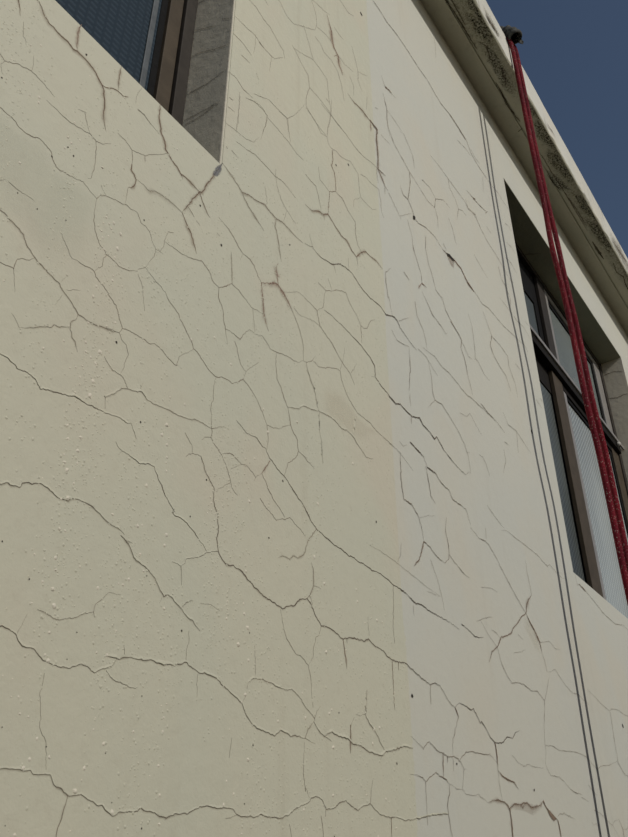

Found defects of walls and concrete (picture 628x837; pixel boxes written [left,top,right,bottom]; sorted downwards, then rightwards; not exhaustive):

leakage [469,0,511,92]
leakage [530,106,574,189]
crack [540,154,590,231]
leakage [575,196,628,276]
crack [0,0,529,640]
crack [0,441,627,837]